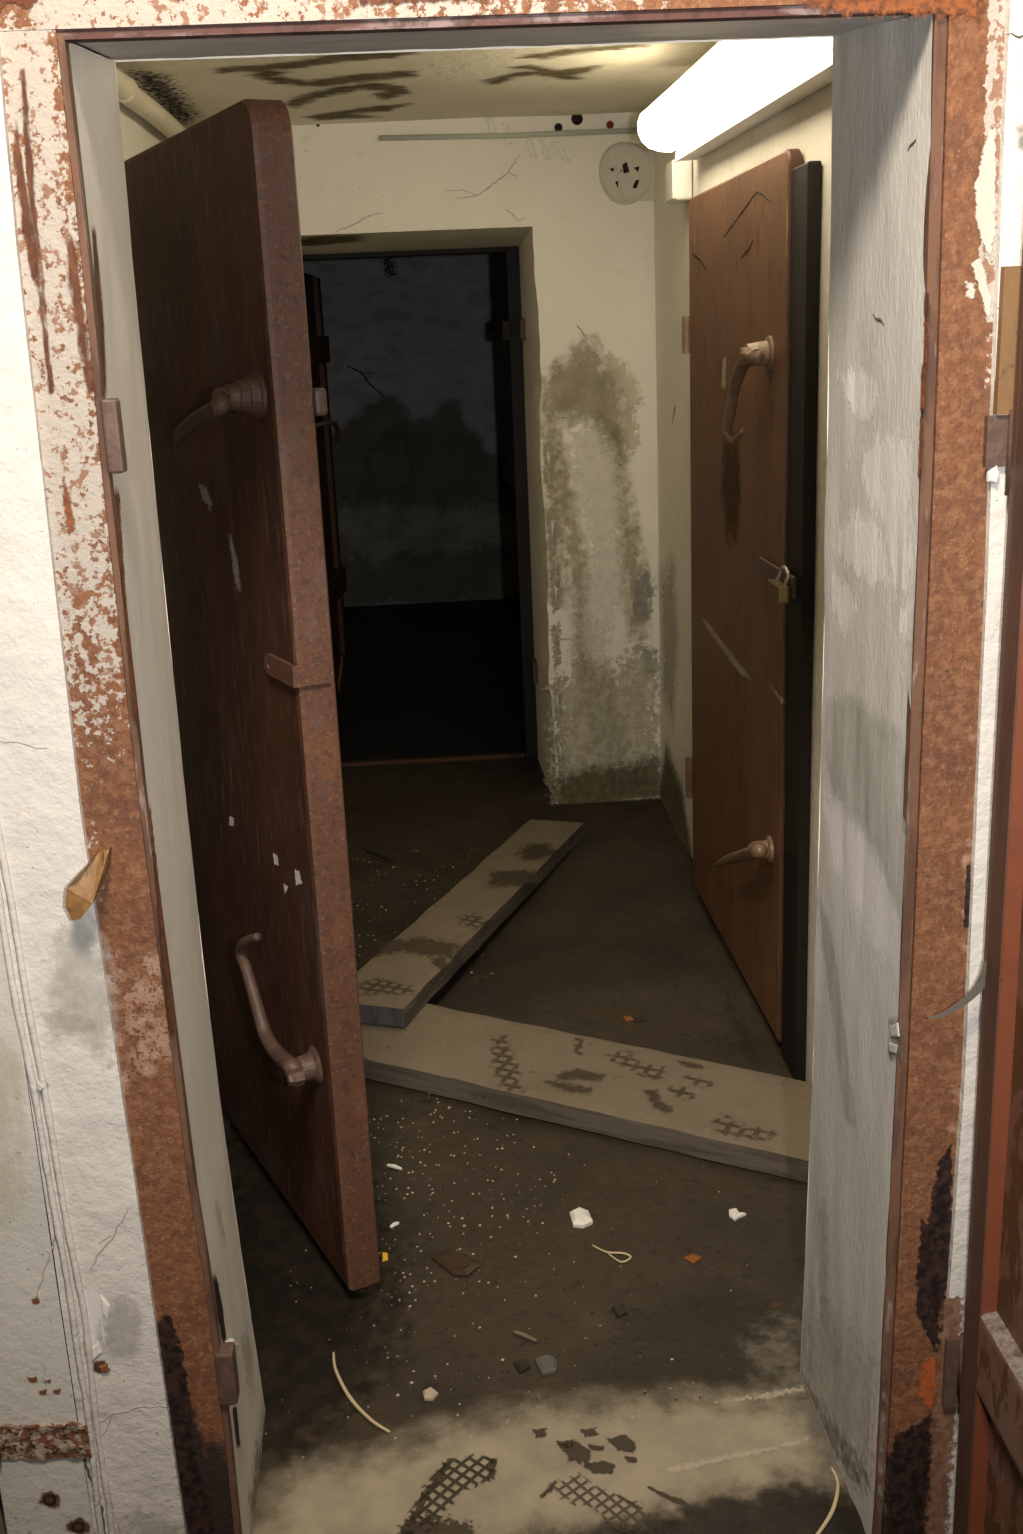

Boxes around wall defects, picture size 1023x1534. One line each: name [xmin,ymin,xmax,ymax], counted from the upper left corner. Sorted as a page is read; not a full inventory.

corrosion [0,0,38,12]
corrosion [803,0,986,22]
corrosion [13,69,53,393]
corrosion [67,228,106,395]
corrosion [918,292,929,477]
corrosion [62,477,75,534]
corrosion [114,488,139,725]
damp [538,346,692,856]
corrosion [147,807,175,1037]
corrosion [27,1377,61,1395]
corrosion [917,1296,964,1534]